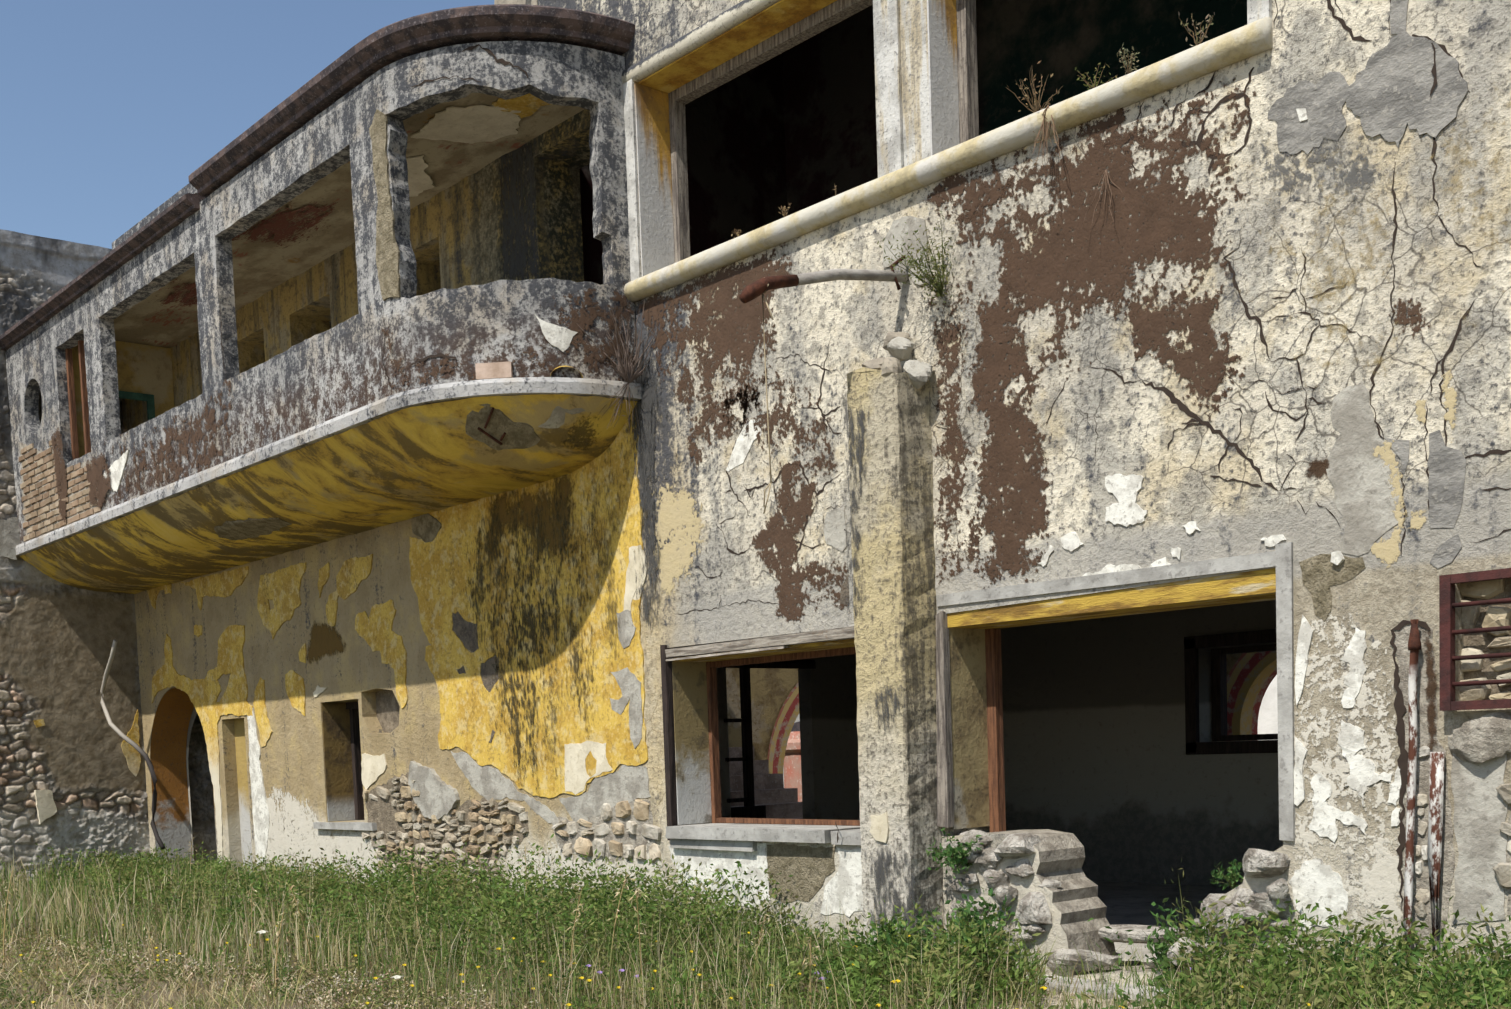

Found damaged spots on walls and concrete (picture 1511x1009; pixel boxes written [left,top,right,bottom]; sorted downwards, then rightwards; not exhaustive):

crack [1085,67,1254,175]
crack [1429,43,1437,96]
crack [1041,137,1511,556]
peeling [121,554,373,866]
flaking render [214,518,292,540]
peeling [361,753,387,790]
peeling [355,599,408,733]
peeling [409,414,651,830]
damp [466,356,666,786]
flaking render [840,575,850,606]
peeling [1309,628,1401,842]
rust [1423,632,1438,750]